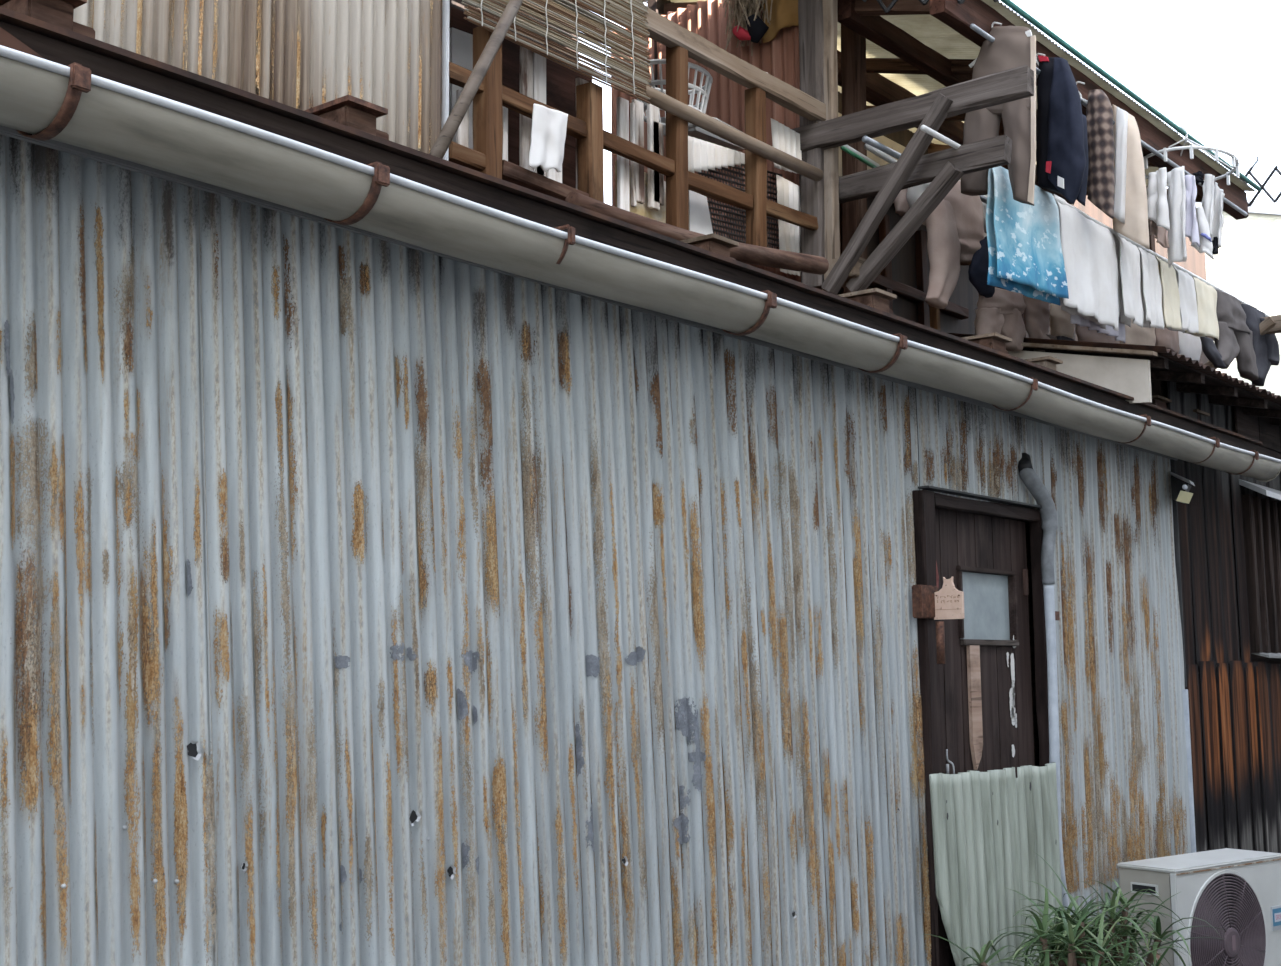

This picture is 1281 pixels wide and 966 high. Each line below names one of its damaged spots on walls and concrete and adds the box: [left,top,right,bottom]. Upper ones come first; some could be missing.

rust [76,168,153,384]
rust [151,180,303,348]
rust [319,232,390,342]
rust [0,313,216,966]
rust [213,275,1022,966]
rust [1040,431,1187,897]